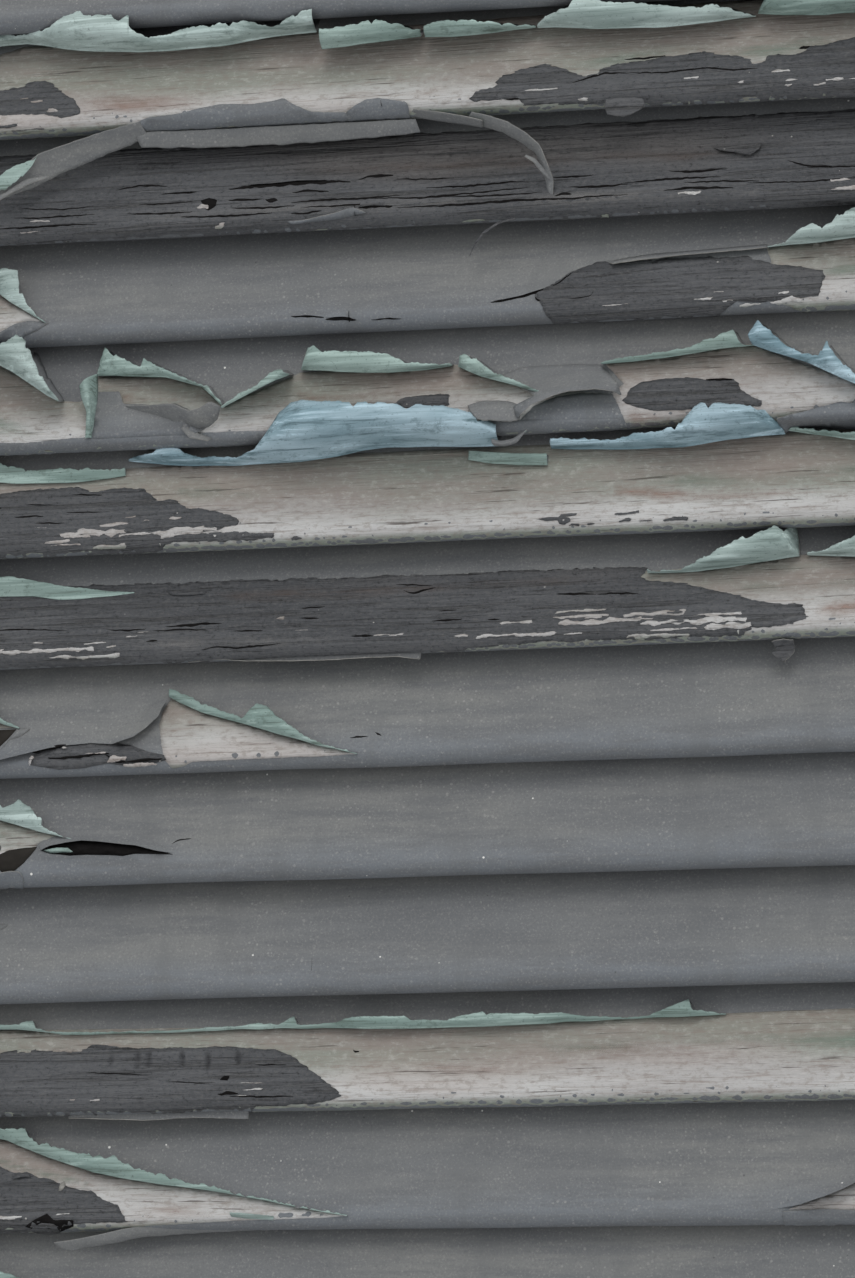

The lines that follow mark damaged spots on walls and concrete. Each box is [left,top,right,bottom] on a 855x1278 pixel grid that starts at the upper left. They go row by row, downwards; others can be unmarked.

peeling [0,0,855,325]
peeling [0,268,855,670]
peeling [0,799,174,889]
peeling [0,689,357,770]
peeling [0,999,855,1251]